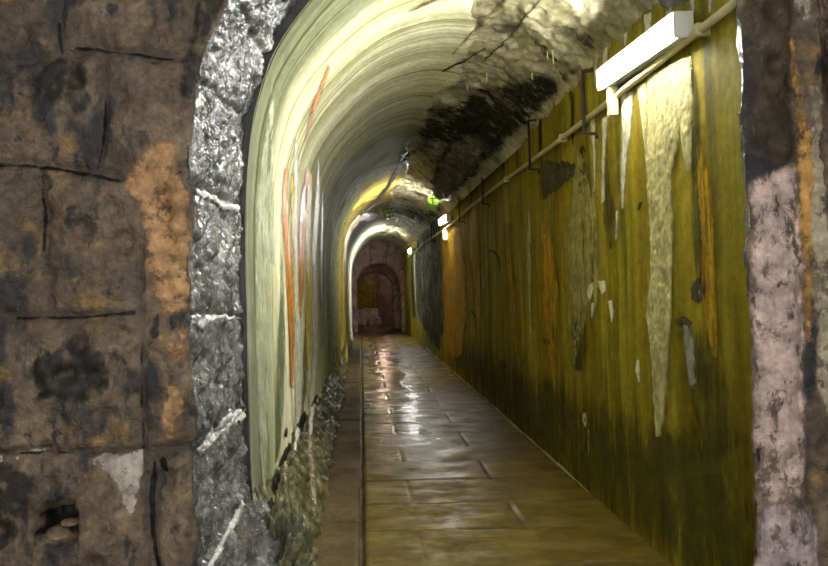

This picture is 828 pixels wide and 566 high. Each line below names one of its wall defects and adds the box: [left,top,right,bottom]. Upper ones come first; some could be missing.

water stain [419,70,574,160]
water stain [567,91,608,366]
water stain [615,55,717,437]
spalling [690,278,706,303]
spalling [44,524,73,540]